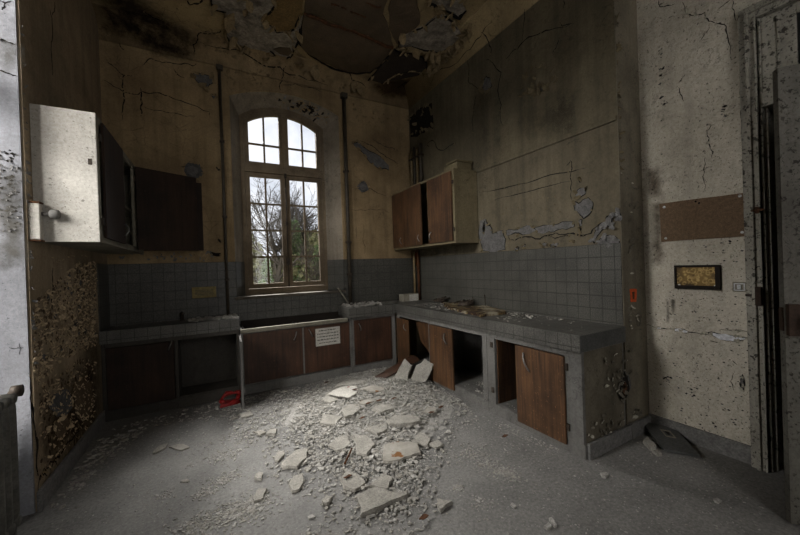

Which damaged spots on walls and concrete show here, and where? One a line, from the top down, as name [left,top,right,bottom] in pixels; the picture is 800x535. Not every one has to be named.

crack [104,30,326,119]
spalling [367,0,470,84]
crack [658,0,736,57]
peeling [0,141,32,232]
spalling [407,103,434,137]
peeling [479,177,594,252]
crack [701,124,714,190]
spalling [31,261,98,468]